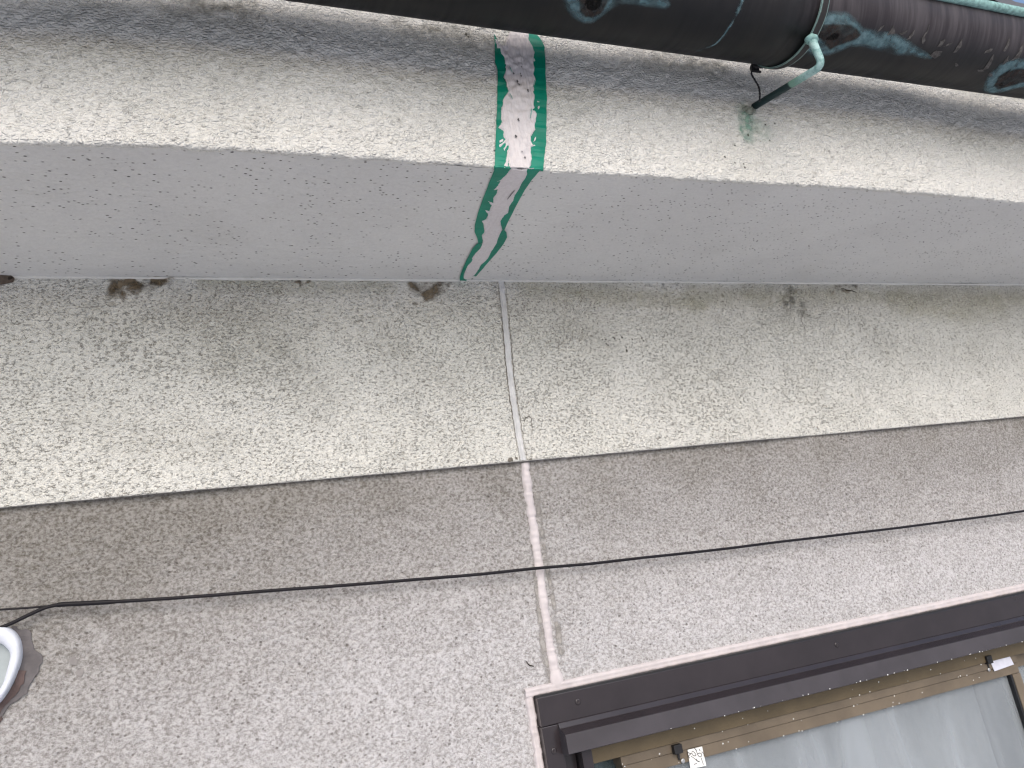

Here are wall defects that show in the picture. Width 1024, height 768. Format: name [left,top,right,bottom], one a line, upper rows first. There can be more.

corrosion [110,276,169,297]